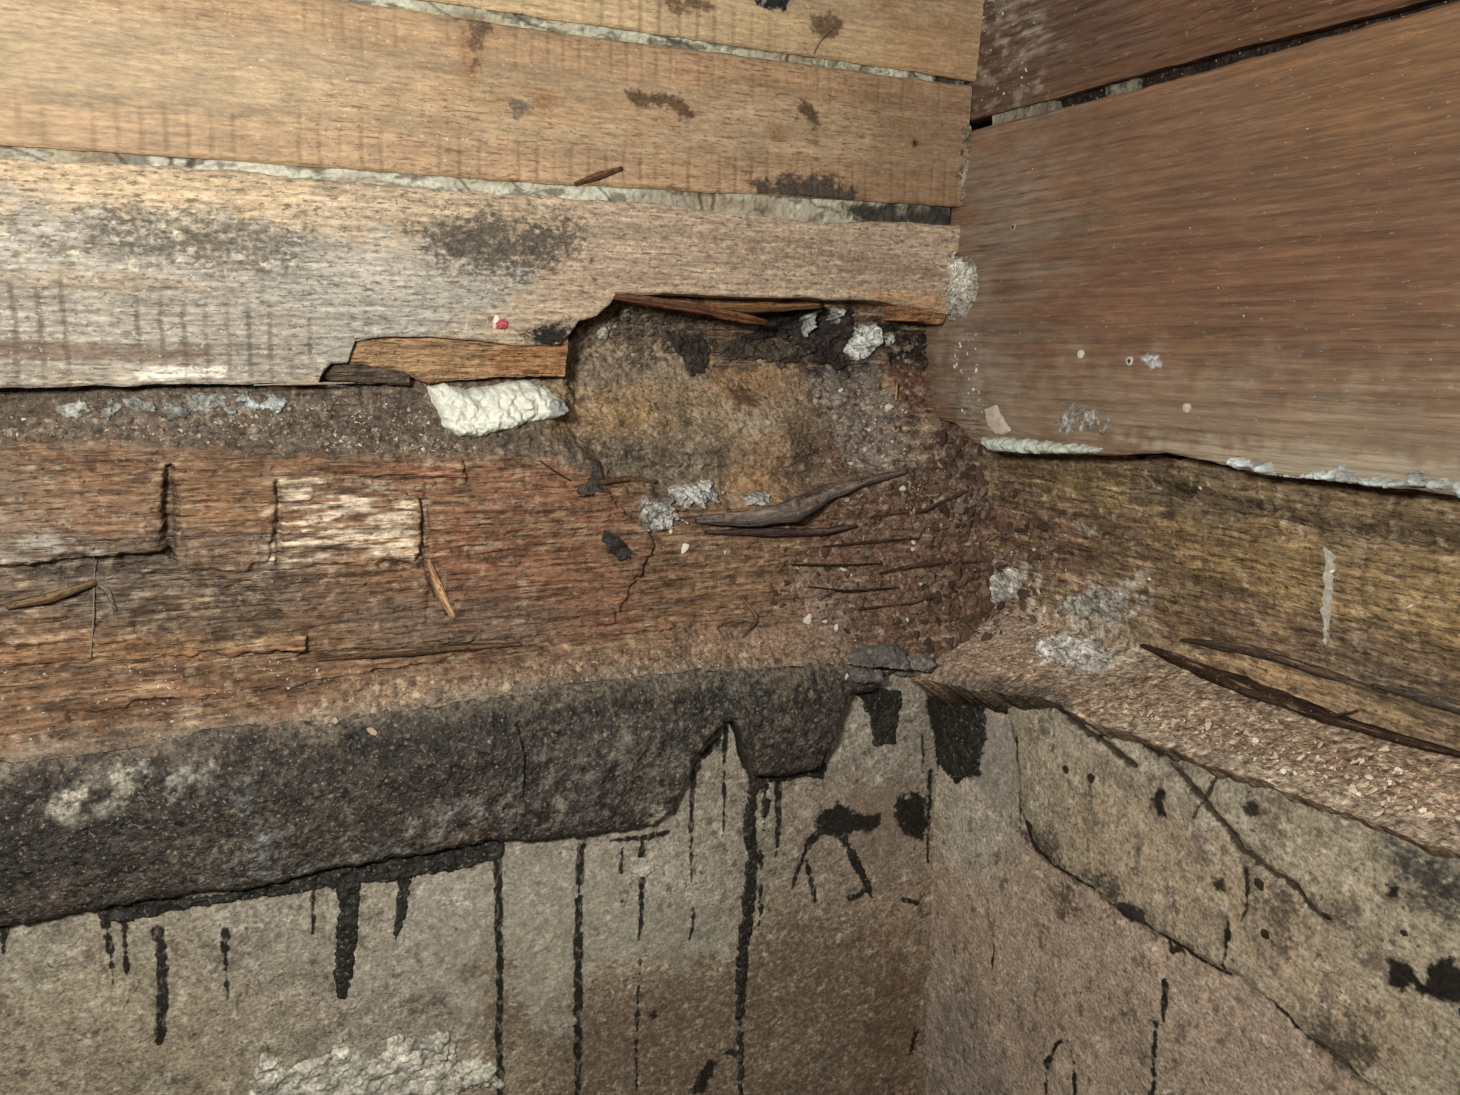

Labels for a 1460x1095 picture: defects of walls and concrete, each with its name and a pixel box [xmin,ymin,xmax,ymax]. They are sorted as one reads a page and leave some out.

leakage [404,202,593,283]
spalling [884,306,945,325]
crack [1024,817,1095,890]
crack [1066,714,1325,976]
leakage [351,845,926,1095]